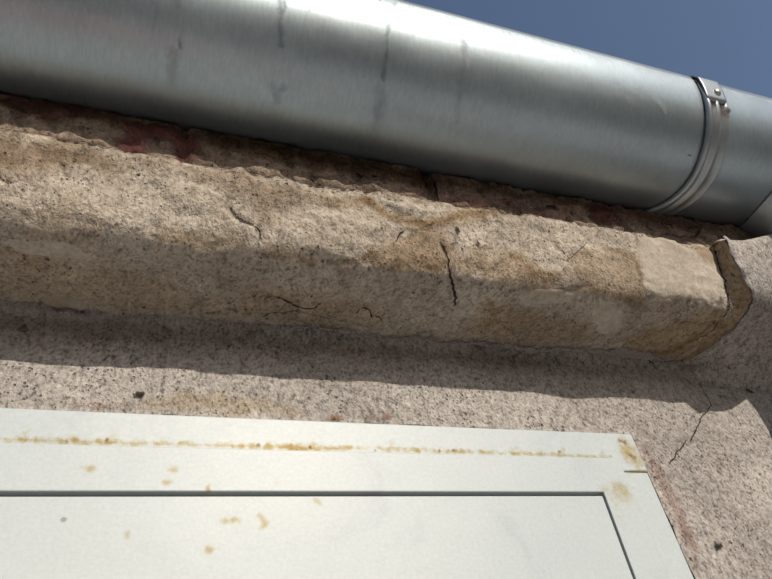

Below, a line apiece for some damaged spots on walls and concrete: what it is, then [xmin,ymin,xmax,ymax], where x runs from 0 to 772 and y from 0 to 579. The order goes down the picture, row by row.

crack [440,242,457,305]
crack [695,250,731,341]
crack [670,385,712,463]